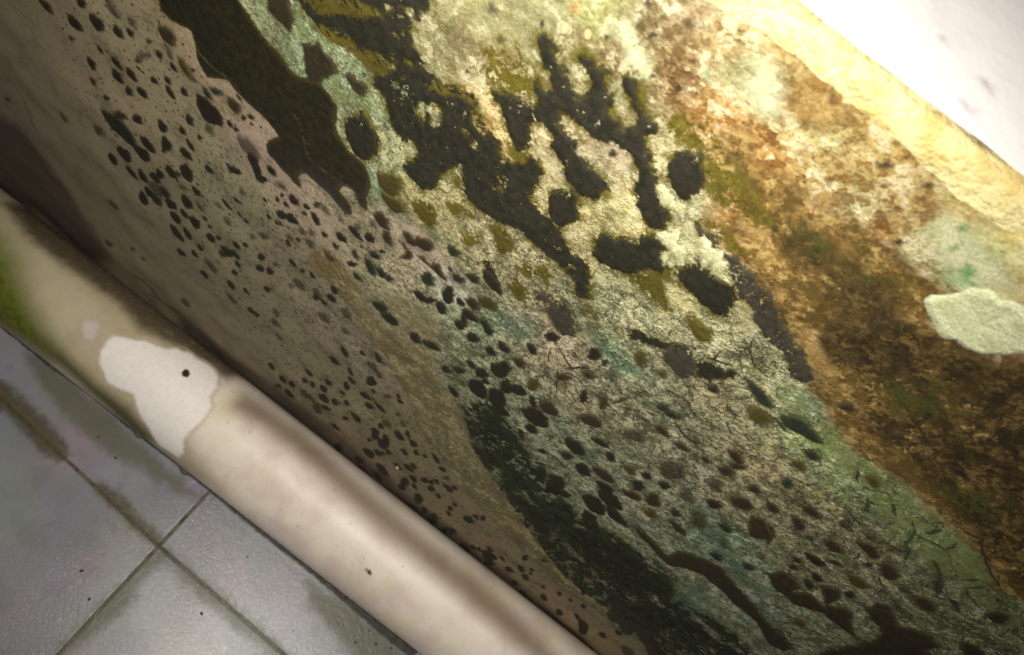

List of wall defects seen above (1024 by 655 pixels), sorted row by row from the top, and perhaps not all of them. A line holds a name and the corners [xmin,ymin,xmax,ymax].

water stain [793,90,845,130]
water stain [33,0,830,655]
water stain [835,402,856,413]
water stain [866,474,881,489]
water stain [768,503,960,655]
water stain [986,611,1011,625]
water stain [960,641,985,655]